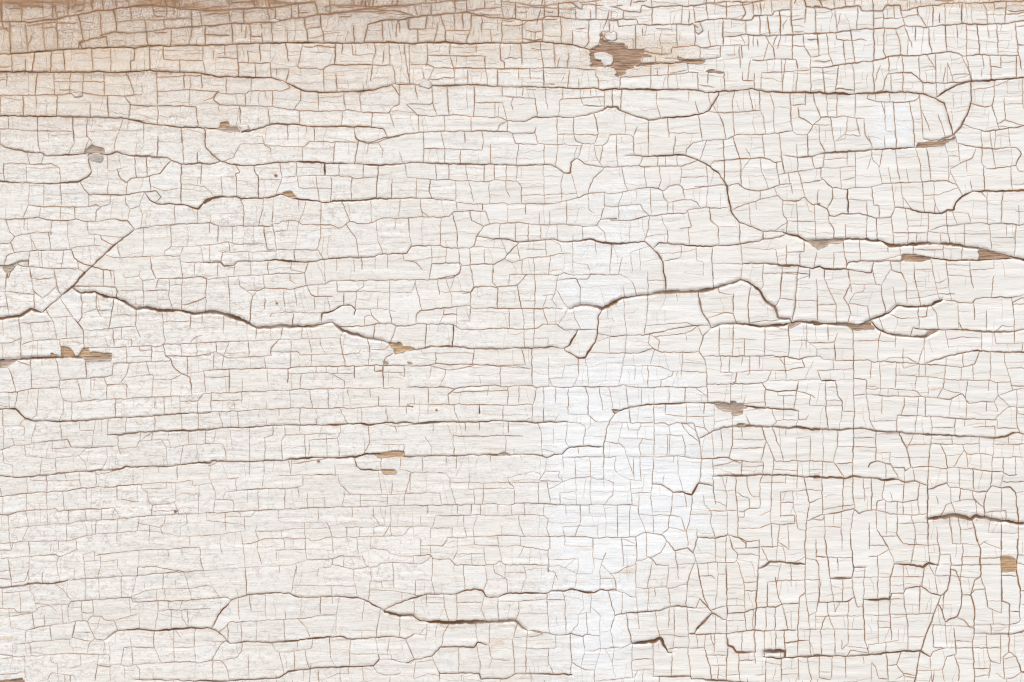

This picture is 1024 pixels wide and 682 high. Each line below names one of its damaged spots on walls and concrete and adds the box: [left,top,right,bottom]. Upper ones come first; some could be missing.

peeling [588,31,657,76]
peeling [51,346,112,362]
peeling [382,342,415,365]
crack [0,370,96,449]
peeling [714,401,747,427]
peeling [375,450,405,475]
crack [198,488,412,569]
crack [404,470,562,537]
crack [0,491,204,654]
peeling [1000,556,1017,572]
crack [101,566,544,682]
crack [525,613,599,675]